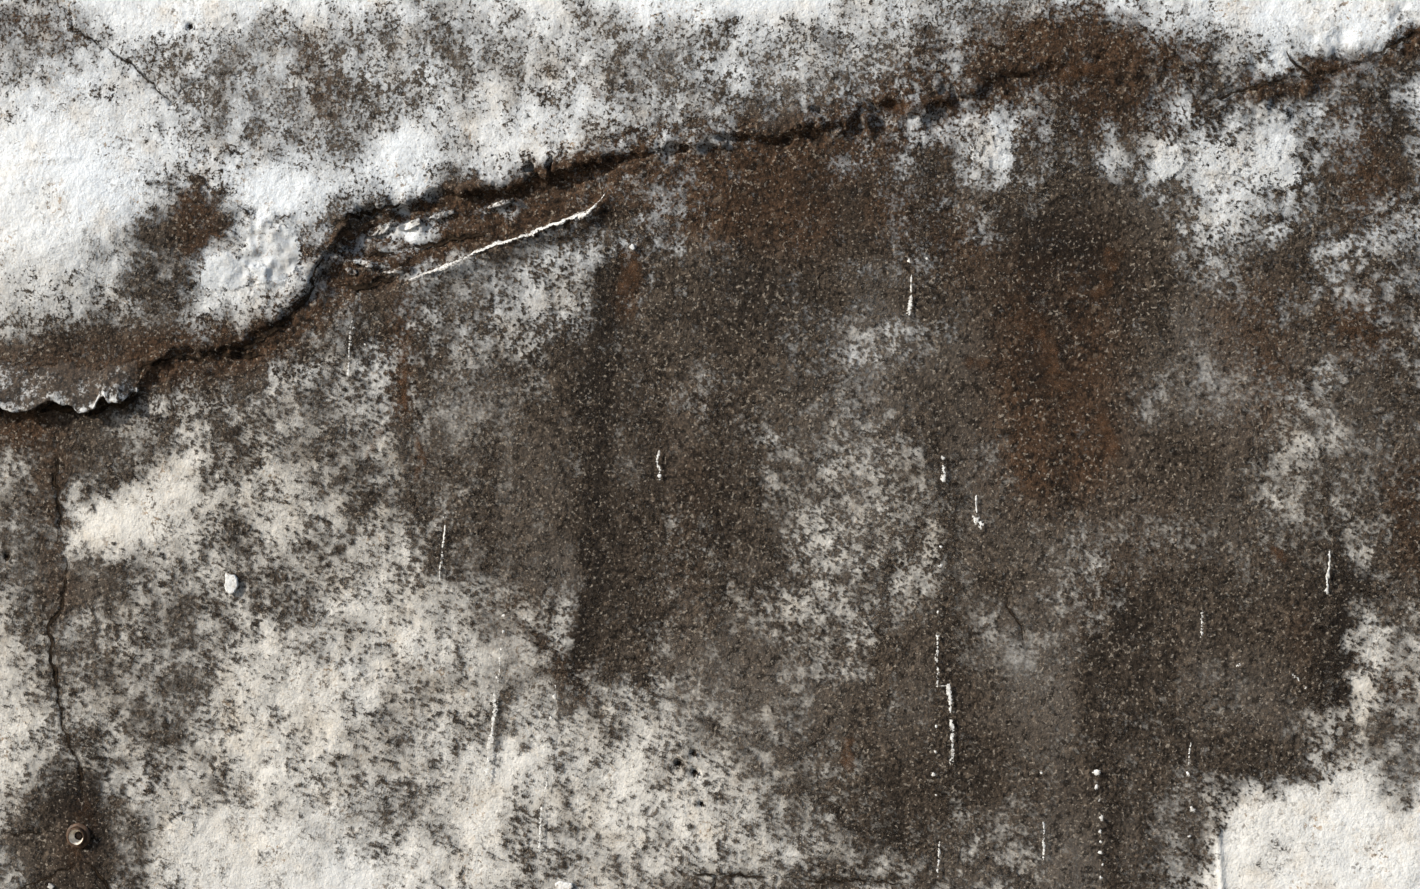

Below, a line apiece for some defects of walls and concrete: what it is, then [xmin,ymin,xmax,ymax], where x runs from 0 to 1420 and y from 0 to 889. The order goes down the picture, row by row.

leakage [0,0,117,95]
leakage [73,79,130,103]
crack [71,22,249,103]
crack [1208,31,1420,103]
spalling [282,137,641,280]
crack [136,203,489,380]
peeling [0,359,138,416]
crack [47,453,84,794]
crack [21,862,110,889]